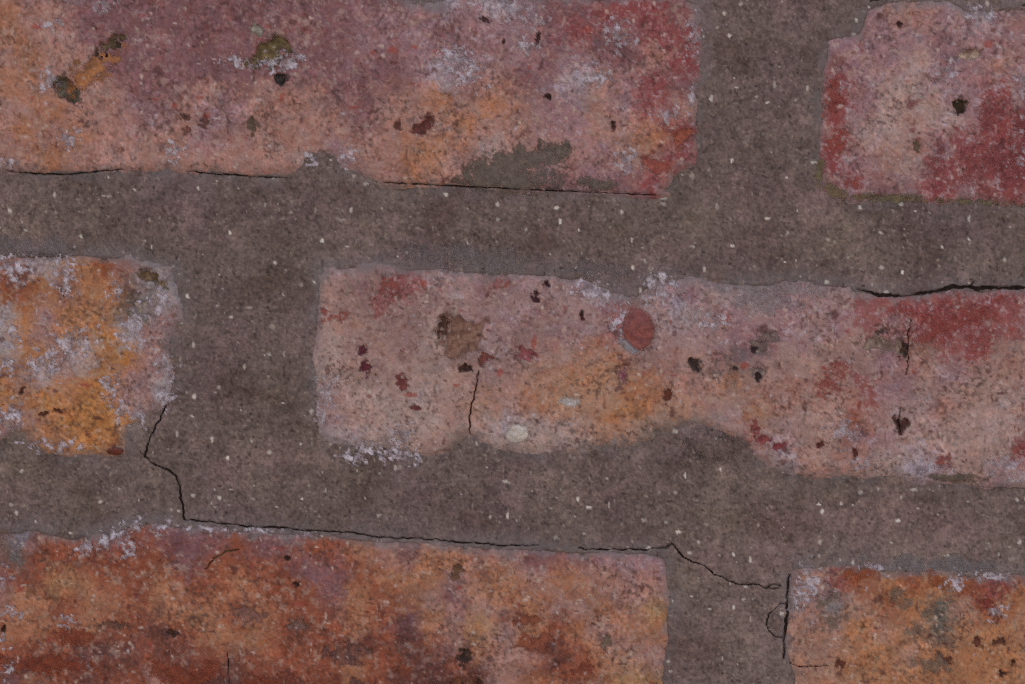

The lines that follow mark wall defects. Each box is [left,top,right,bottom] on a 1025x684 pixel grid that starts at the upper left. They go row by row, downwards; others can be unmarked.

crack [858,281,1025,298]
crack [139,406,534,566]
crack [580,543,829,667]